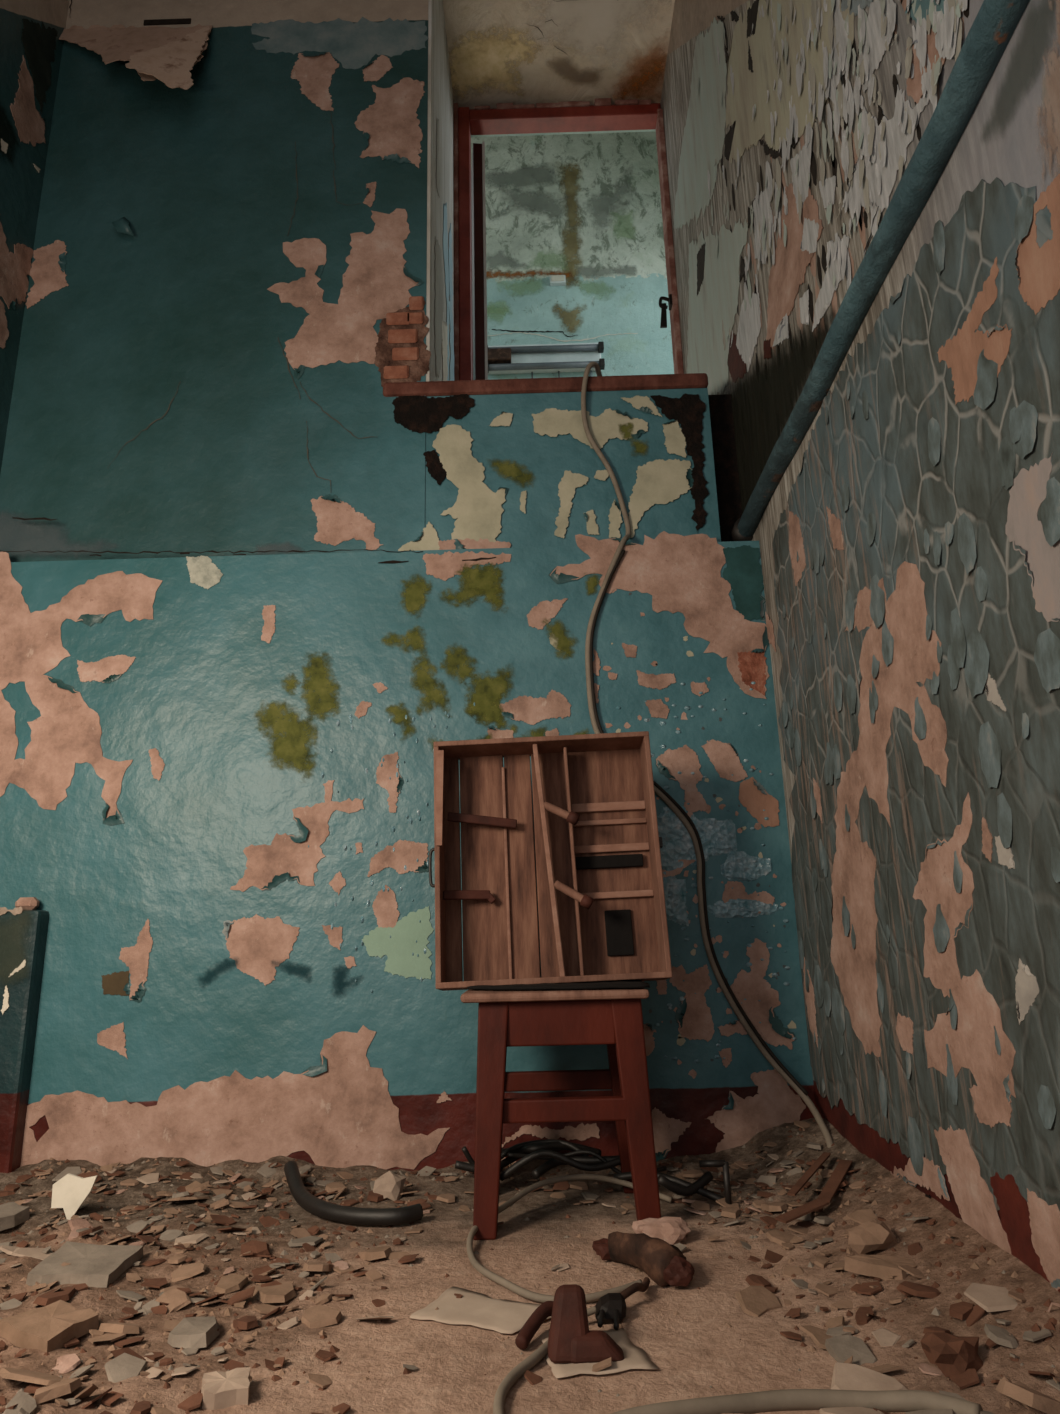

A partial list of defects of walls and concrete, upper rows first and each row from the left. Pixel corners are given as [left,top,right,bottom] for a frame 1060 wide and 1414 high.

leakage [555,62,597,83]
peeling [0,222,69,349]
peeling [267,52,455,387]
peeling [311,424,527,581]
peeling [0,552,162,826]
mould [256,653,339,778]
mould [382,564,546,739]
peeling [487,690,571,739]
mould [545,621,575,658]
mould [586,575,599,595]
peeling [527,0,1060,1292]
peeling [20,1022,449,1220]